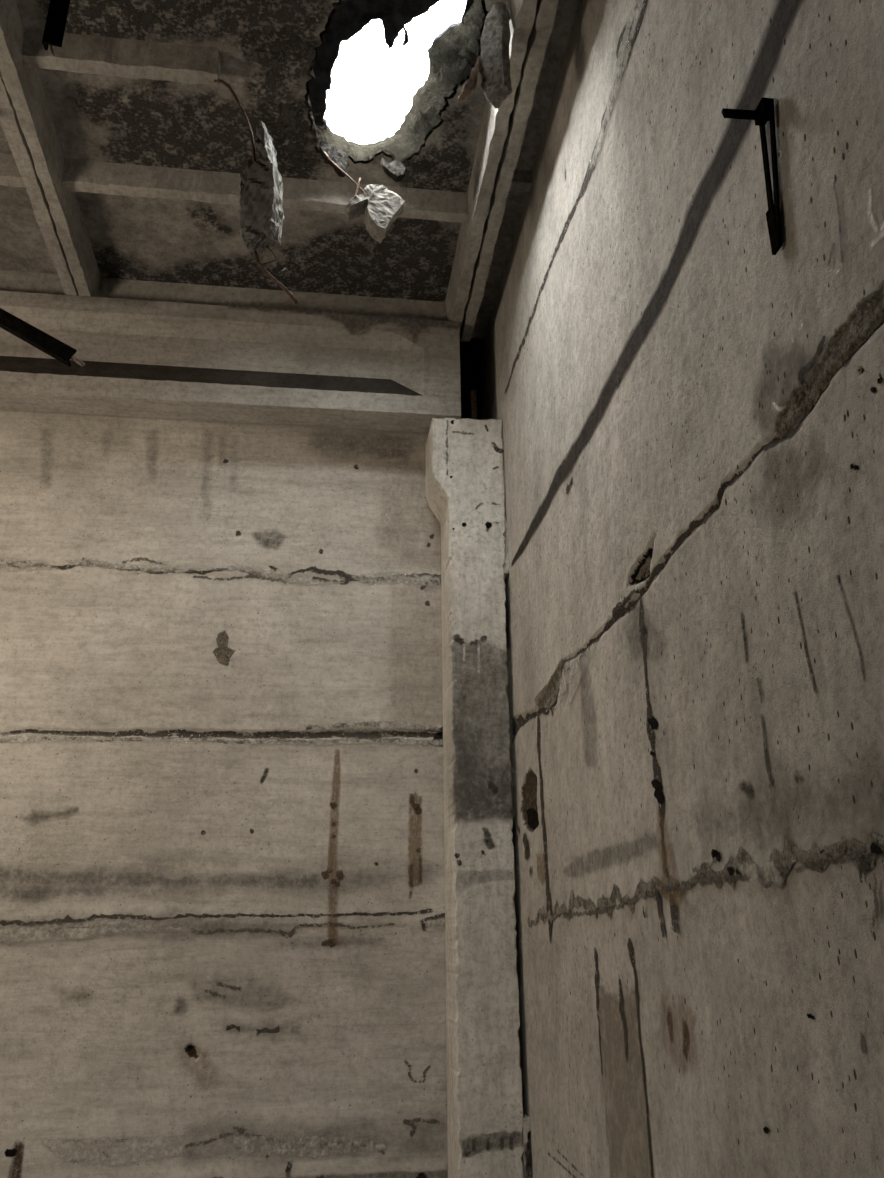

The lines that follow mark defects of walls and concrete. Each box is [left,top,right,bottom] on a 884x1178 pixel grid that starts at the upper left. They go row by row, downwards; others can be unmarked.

water stain [65,0,347,180]
spalling [305,0,486,161]
water stain [400,104,472,193]
water stain [92,218,458,302]
crack [0,557,441,590]
crack [512,280,884,943]
crack [0,720,443,747]
rust [321,751,343,948]
rust [408,793,422,898]
spalling [517,769,539,876]
crack [0,909,432,942]
rust [5,1143,24,1178]